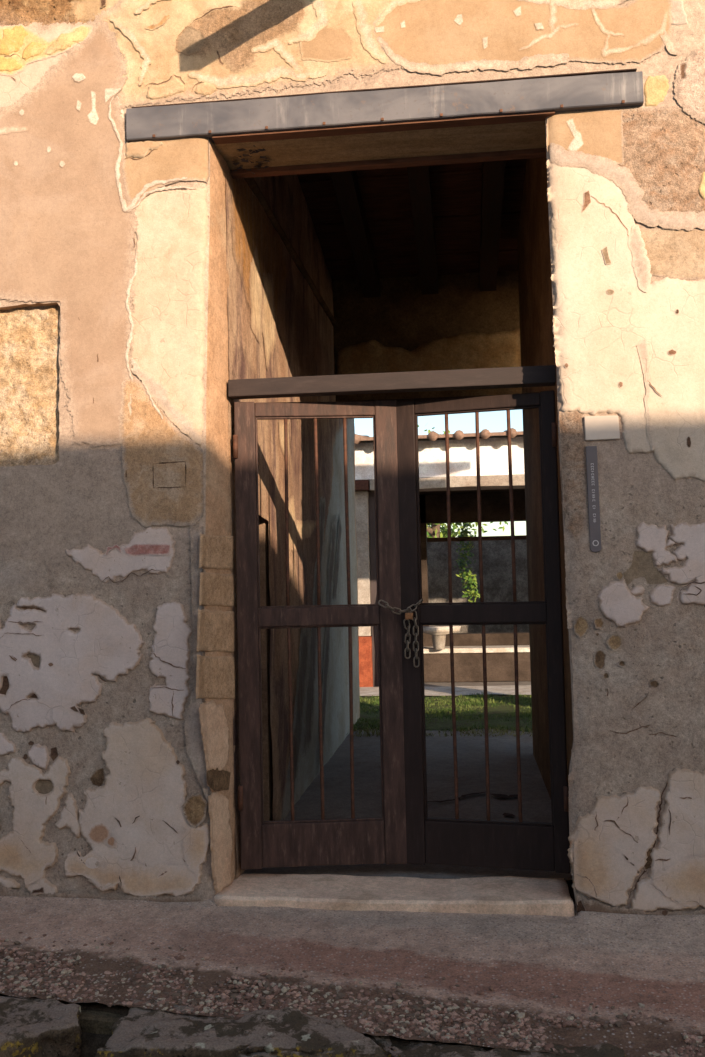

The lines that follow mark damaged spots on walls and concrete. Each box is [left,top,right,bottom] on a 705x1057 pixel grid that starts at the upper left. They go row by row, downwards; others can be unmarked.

peeling [518,0,626,10]
crack [518,0,679,57]
peeling [0,0,569,899]
spalling [546,46,705,913]
crack [595,769,692,901]